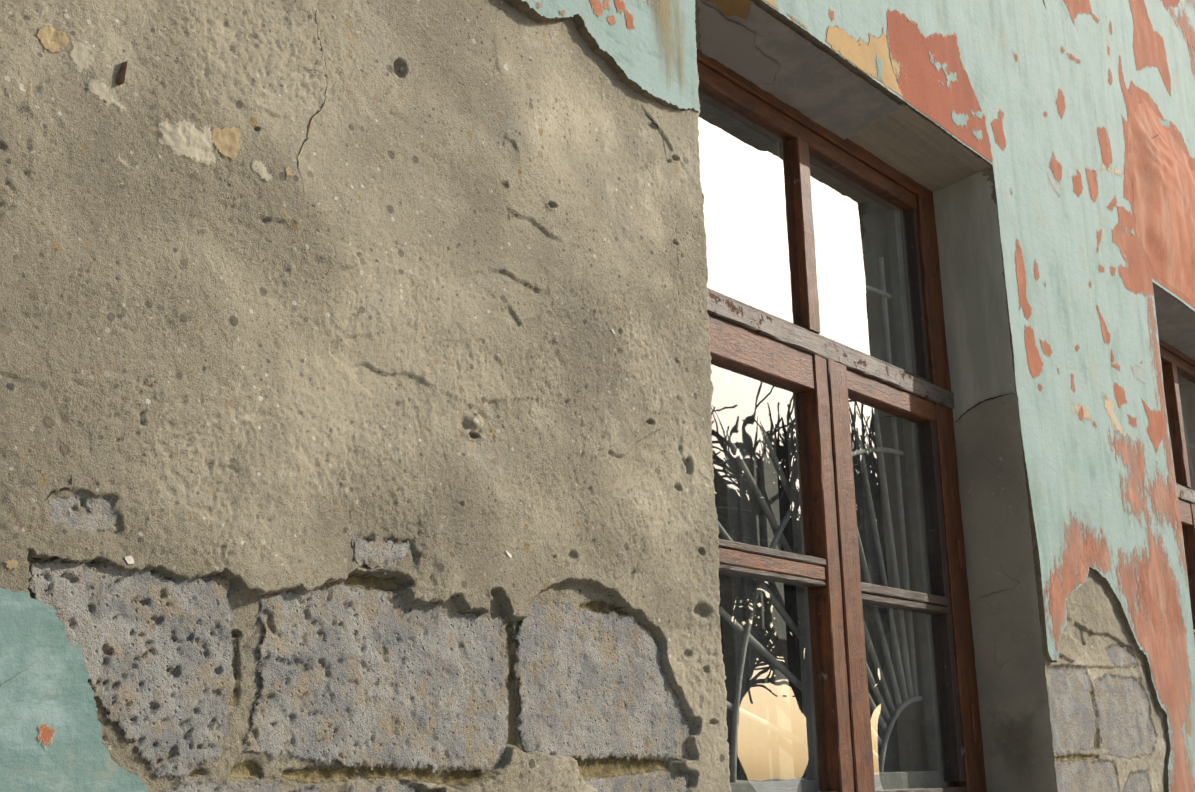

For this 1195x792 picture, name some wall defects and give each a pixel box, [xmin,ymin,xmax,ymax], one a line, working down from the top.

crack [297,3,327,223]
peeling [826,9,1007,164]
spalling [0,0,732,792]
crack [44,476,72,501]
crack [32,556,109,565]